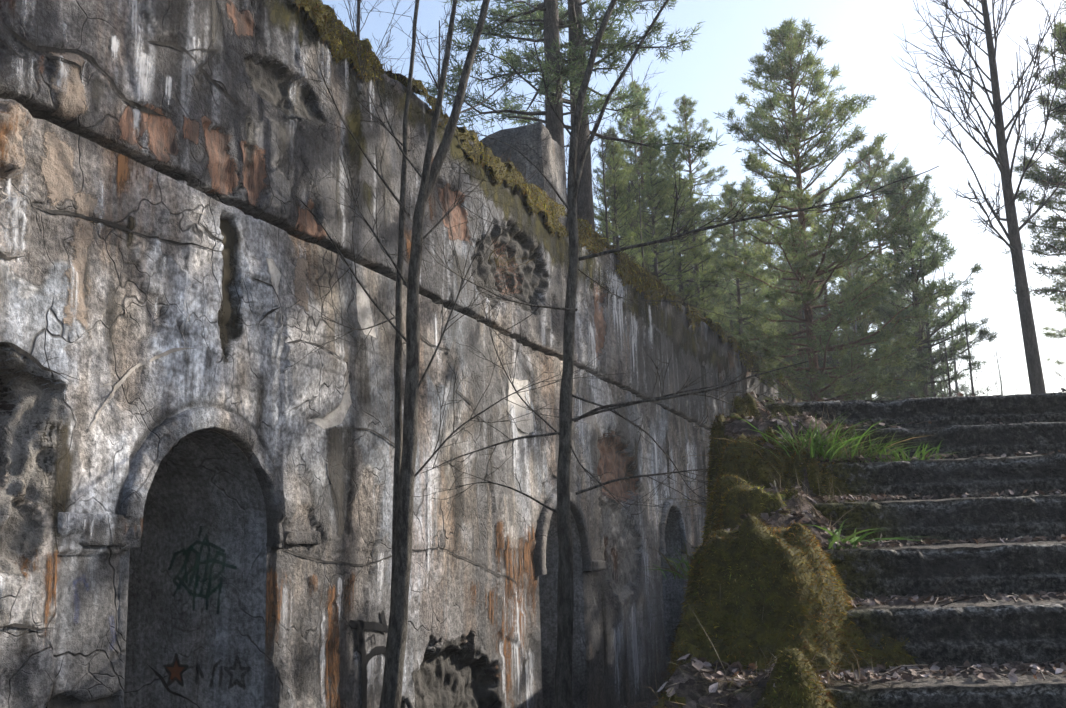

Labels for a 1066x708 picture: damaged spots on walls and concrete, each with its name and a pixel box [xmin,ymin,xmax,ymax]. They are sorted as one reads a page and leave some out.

crack [35,205,224,252]
spalling [436,183,551,312]
spalling [0,341,68,576]
spalling [597,430,642,608]
crack [0,623,55,639]
crack [45,657,64,708]
rust [266,568,287,645]
rust [311,573,355,708]
spalling [412,637,500,708]
rust [470,521,537,708]